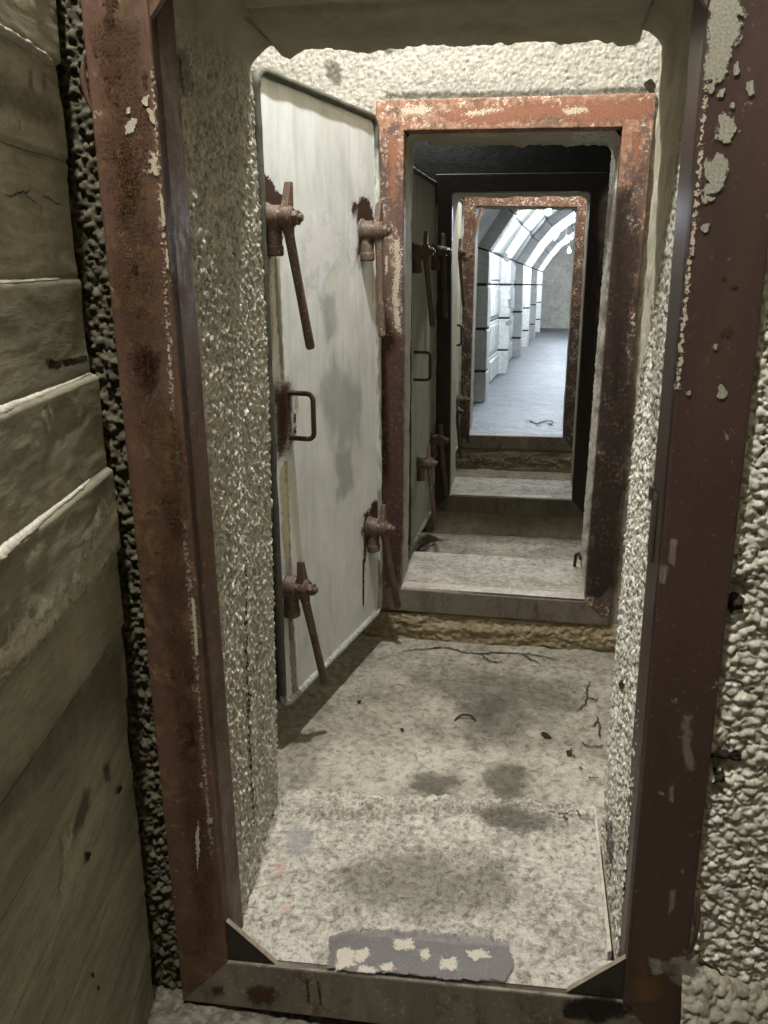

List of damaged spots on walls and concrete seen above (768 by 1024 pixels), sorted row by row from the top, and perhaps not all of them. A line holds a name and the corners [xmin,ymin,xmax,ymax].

peeling [125,95,156,134]
peeling [143,152,159,176]
corrosion [440,96,658,167]
peeling [700,0,754,204]
corrosion [586,189,639,597]
peeling [716,384,728,399]
corrosion [79,0,224,950]
crack [407,647,573,664]
crack [568,683,603,779]
water stain [410,774,454,796]
water stain [481,764,550,830]